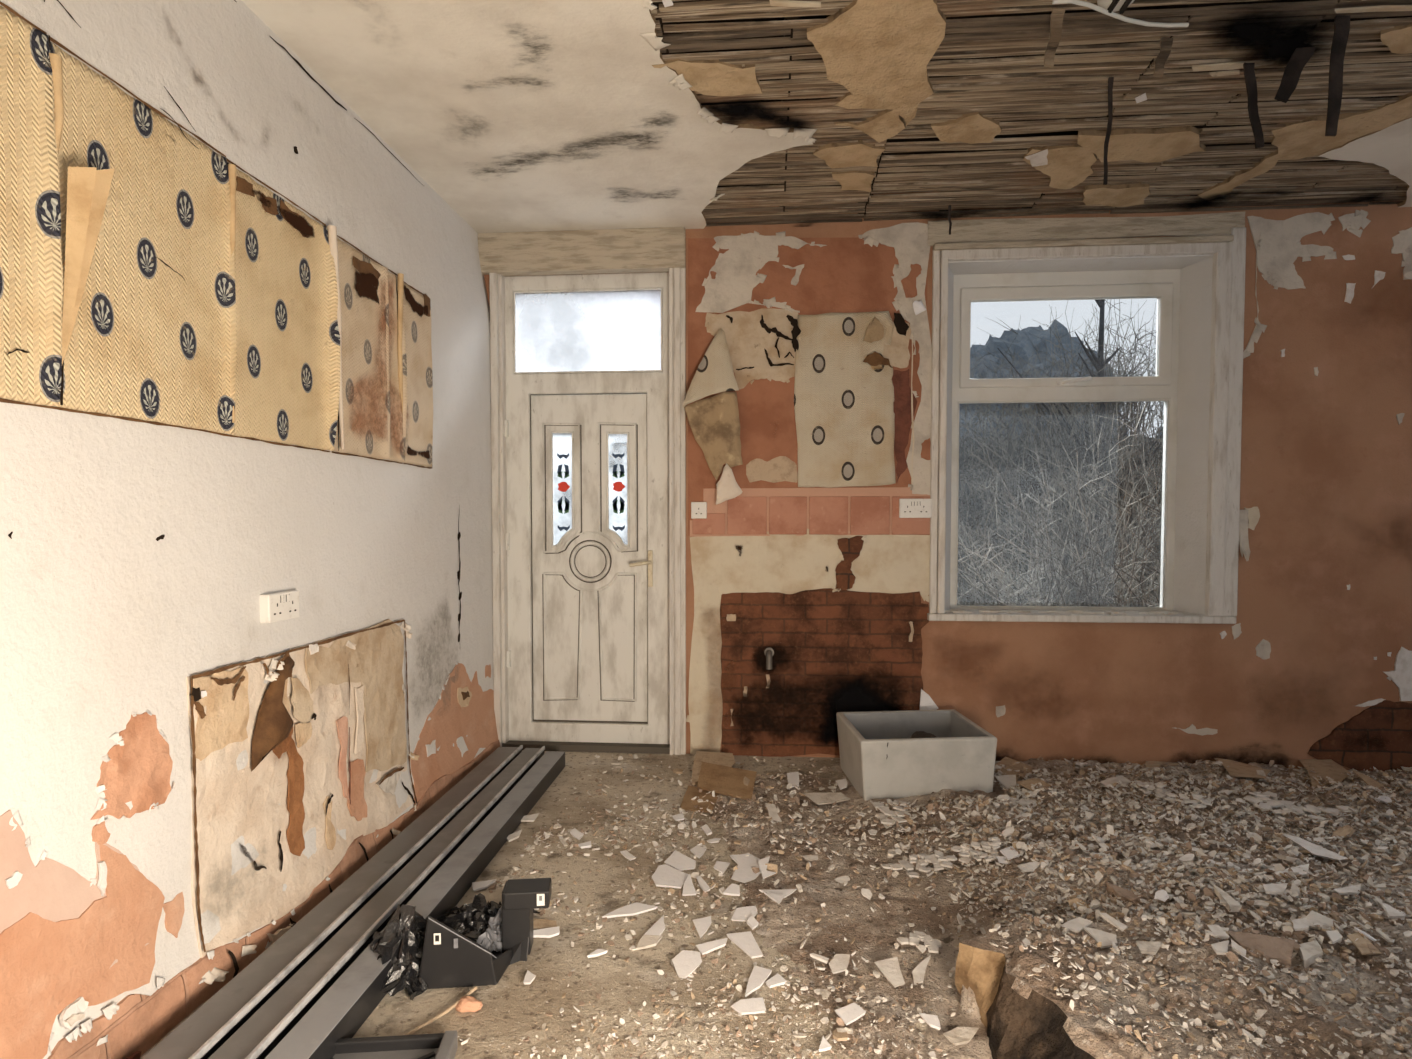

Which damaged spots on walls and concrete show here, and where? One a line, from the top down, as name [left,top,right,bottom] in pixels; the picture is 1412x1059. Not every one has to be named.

leakage [483,118,671,172]
peeling [695,231,827,313]
peeling [858,222,939,495]
peeling [1243,210,1371,359]
peeling [1391,227,1412,280]
flaking render [720,536,1031,757]
flaking render [1307,647,1412,772]
flaking render [0,661,500,1059]